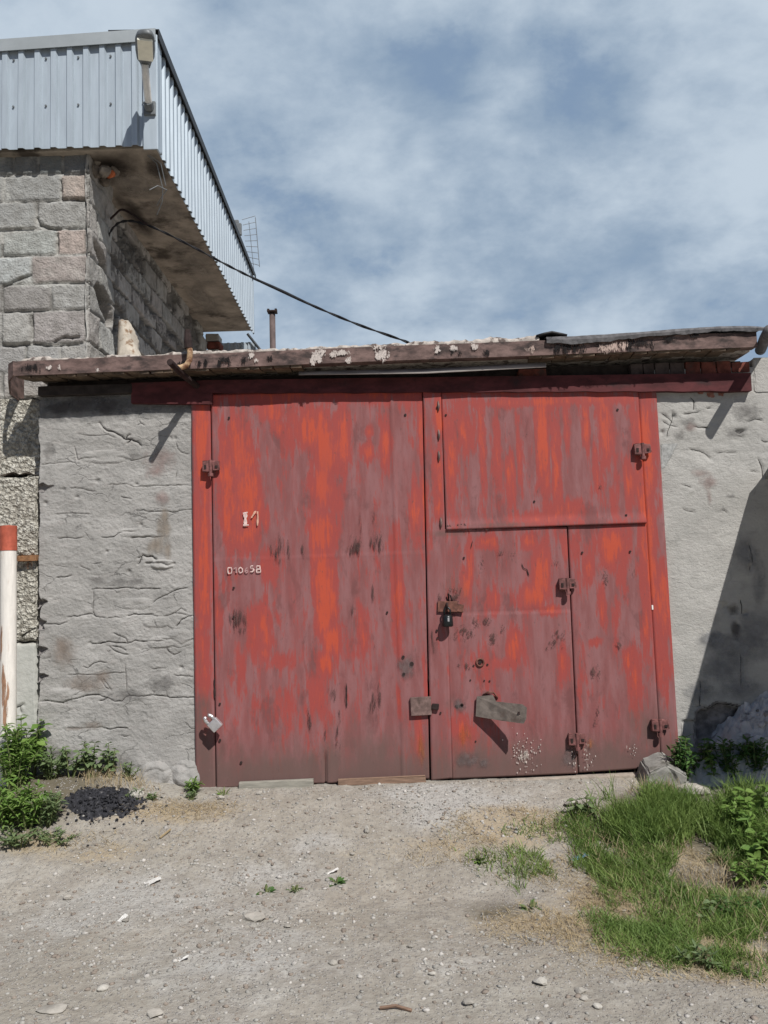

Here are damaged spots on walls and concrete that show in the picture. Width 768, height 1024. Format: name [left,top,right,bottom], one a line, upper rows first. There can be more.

water stain [98,159,134,171]
peeling [310,347,351,366]
peeling [373,344,390,362]
peeling [598,342,628,353]
crack [663,397,767,477]
crack [47,420,191,563]
crack [18,563,216,708]